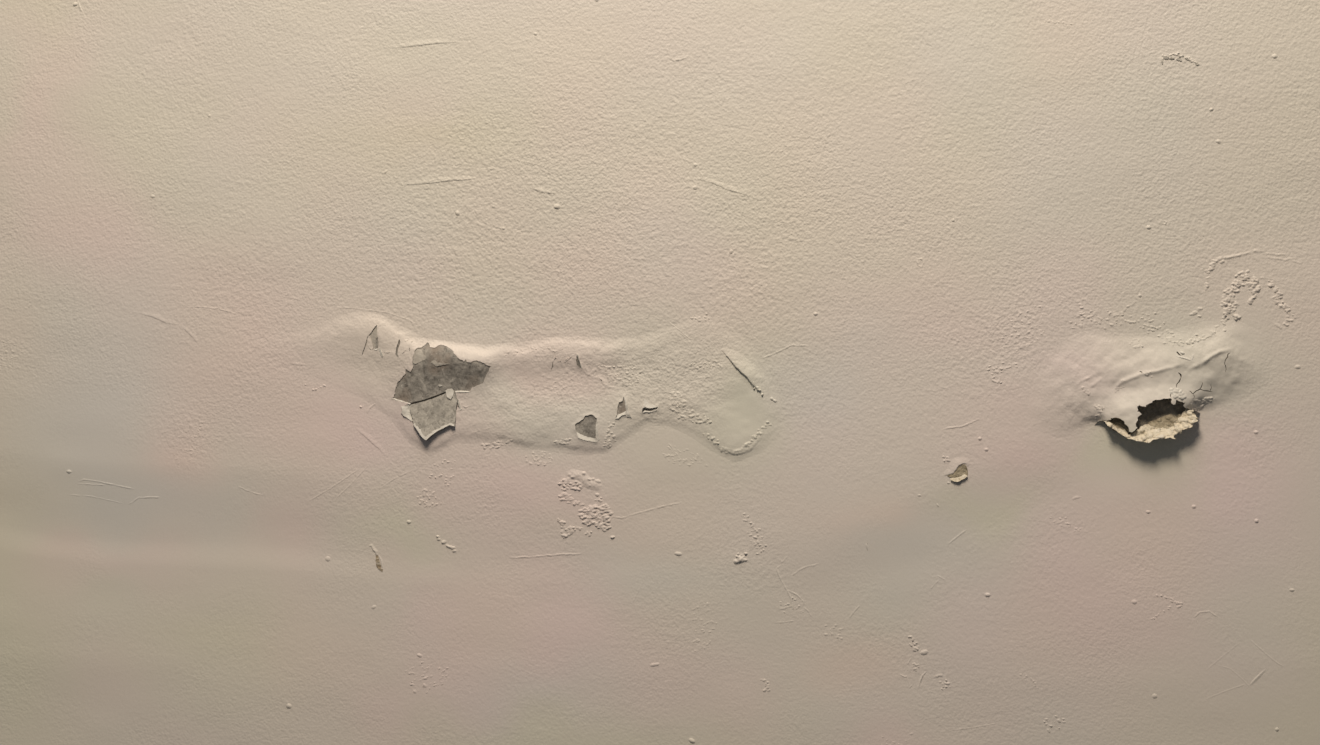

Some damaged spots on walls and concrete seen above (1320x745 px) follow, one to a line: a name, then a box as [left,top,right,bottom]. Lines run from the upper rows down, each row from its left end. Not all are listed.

peeling [392,339,490,440]
peeling [616,397,657,419]
peeling [575,415,600,442]
peeling [942,455,971,485]